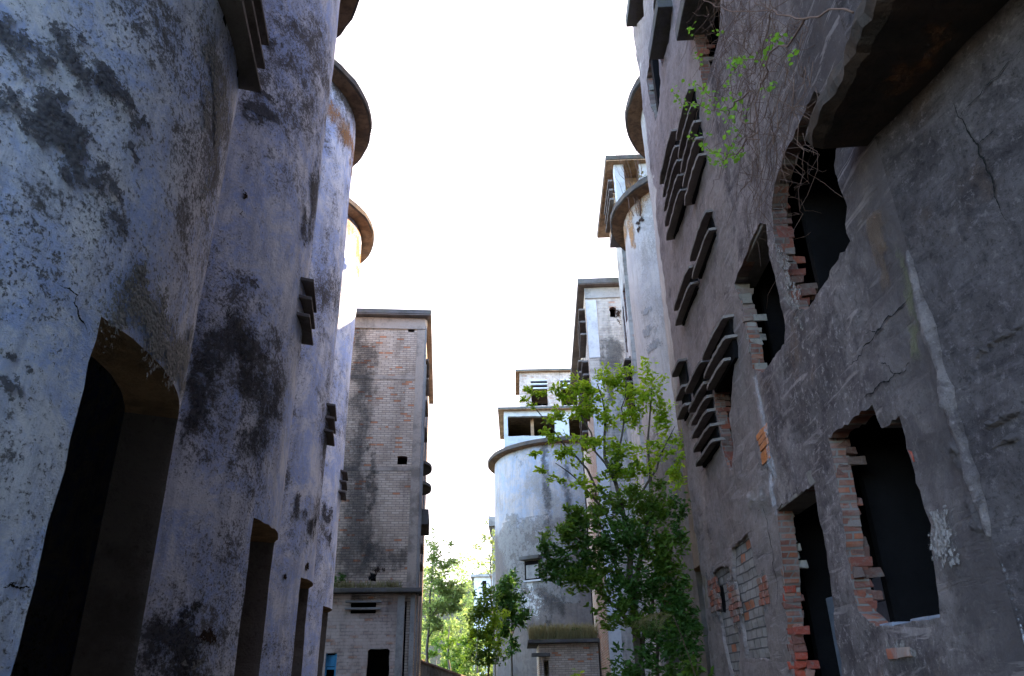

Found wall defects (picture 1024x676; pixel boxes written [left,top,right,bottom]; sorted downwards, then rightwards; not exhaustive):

crack [954,51,1020,220]
spalling [773,236,804,330]
leakage [179,303,282,464]
crack [851,292,912,395]
leakage [338,331,406,576]
flaking render [756,423,771,470]
flaking render [705,567,743,634]